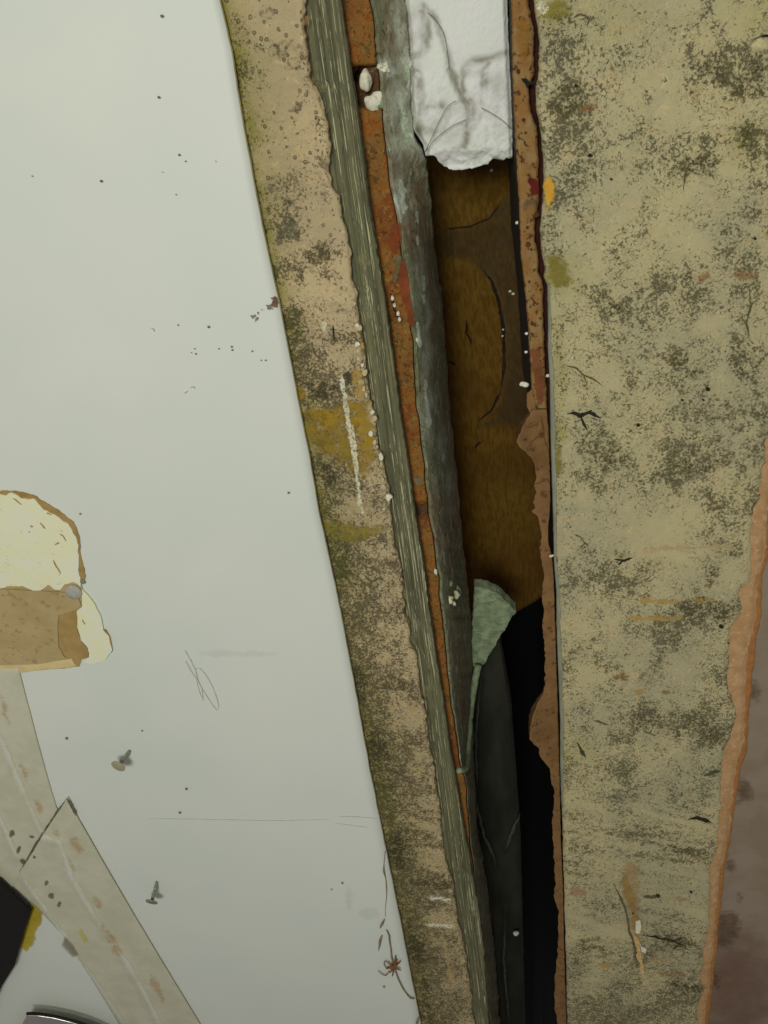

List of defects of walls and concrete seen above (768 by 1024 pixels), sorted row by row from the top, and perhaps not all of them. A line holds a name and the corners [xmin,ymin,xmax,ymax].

water stain [684,51,767,104]
water stain [543,177,555,213]
water stain [680,155,725,186]
water stain [389,223,414,326]
spalling [530,349,545,405]
water stain [297,369,376,514]
crack [568,410,601,431]
water stain [556,430,634,480]
peeling [449,580,462,606]
water stain [630,597,738,627]
flaking render [697,437,768,1024]
water stain [367,723,453,891]